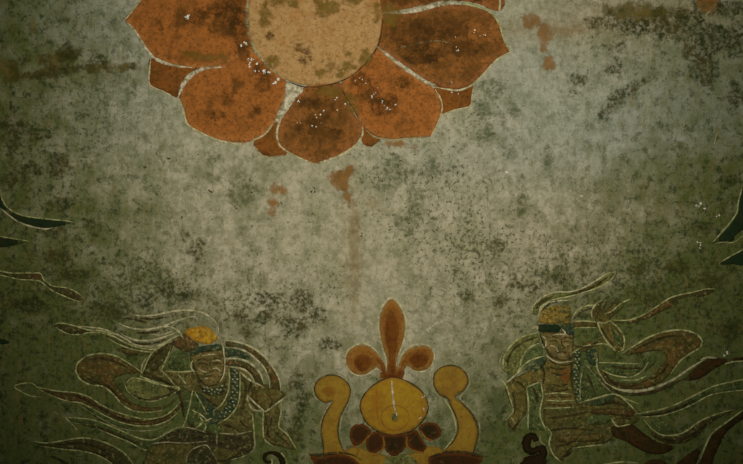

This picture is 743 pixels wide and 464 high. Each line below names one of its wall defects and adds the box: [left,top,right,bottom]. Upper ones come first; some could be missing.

damp [584,0,743,86]
damp [598,79,646,121]
damp [235,291,283,338]
damp [279,289,325,338]